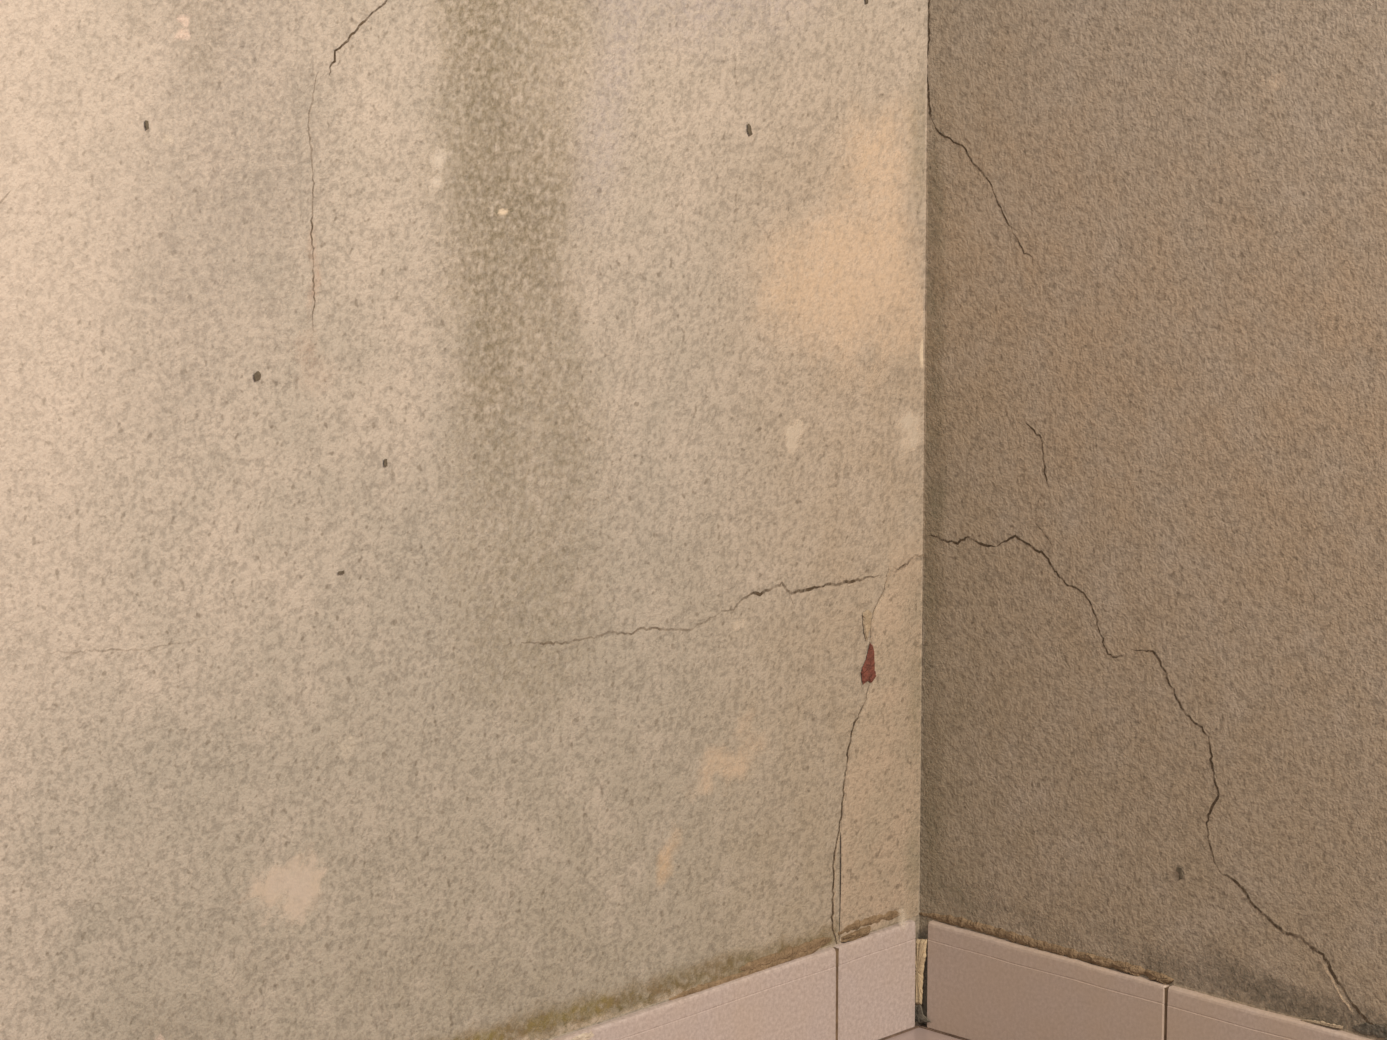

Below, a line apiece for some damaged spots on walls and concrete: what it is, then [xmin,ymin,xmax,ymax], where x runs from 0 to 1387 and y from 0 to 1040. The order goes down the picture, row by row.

crack [329,0,387,75]
crack [927,0,1033,263]
crack [1026,423,1049,487]
crack [747,524,1374,1025]